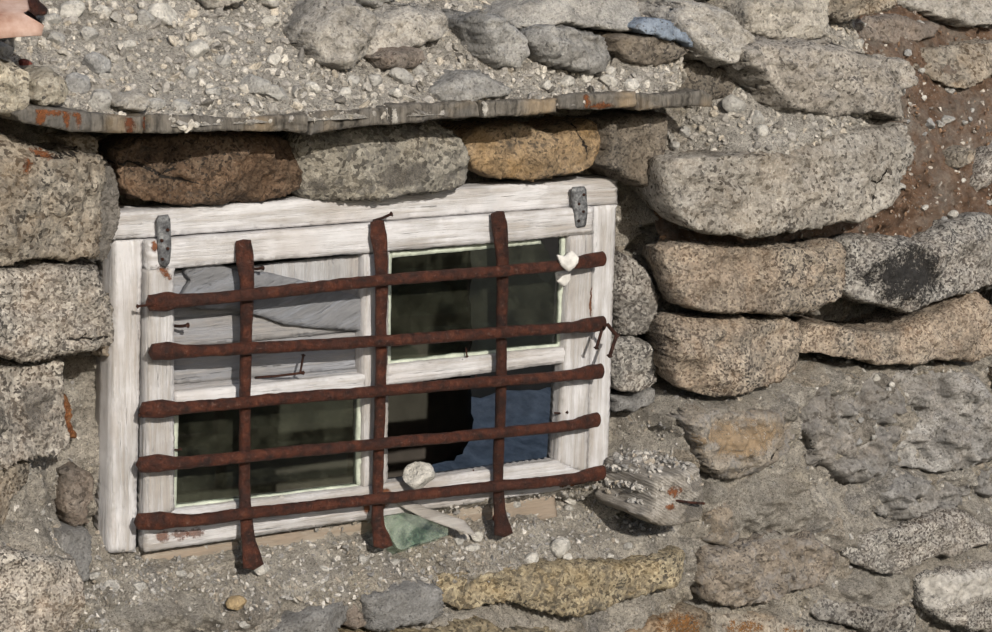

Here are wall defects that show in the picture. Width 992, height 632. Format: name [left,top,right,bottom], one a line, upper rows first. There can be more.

corrosion [36,109,81,128]
crack [871,166,889,210]
corrosion [157,529,205,542]